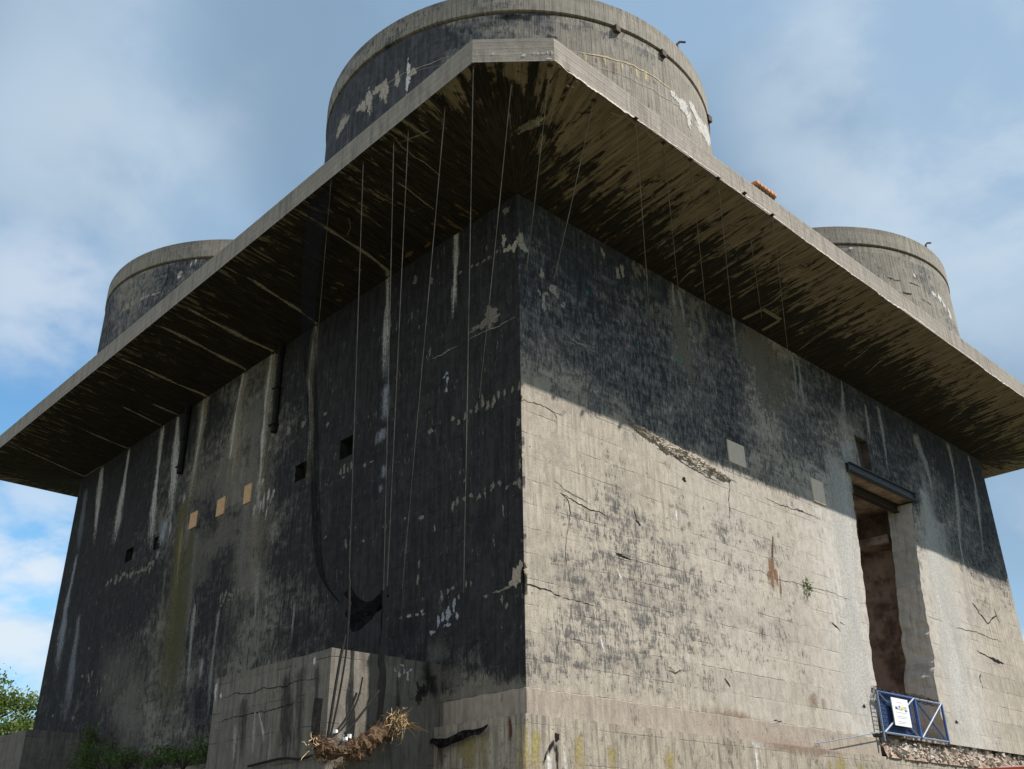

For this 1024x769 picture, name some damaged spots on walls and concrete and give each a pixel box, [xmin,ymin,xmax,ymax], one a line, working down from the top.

peeling [336,61,417,140]
peeling [670,90,711,146]
leakage [17,446,103,531]
leakage [87,431,130,540]
leakage [123,359,210,703]
leakage [162,309,278,623]
spalling [484,560,529,609]
crack [525,583,597,607]
crack [557,482,608,562]
spalling [632,423,731,485]
rust [767,537,782,594]
crack [218,678,319,723]